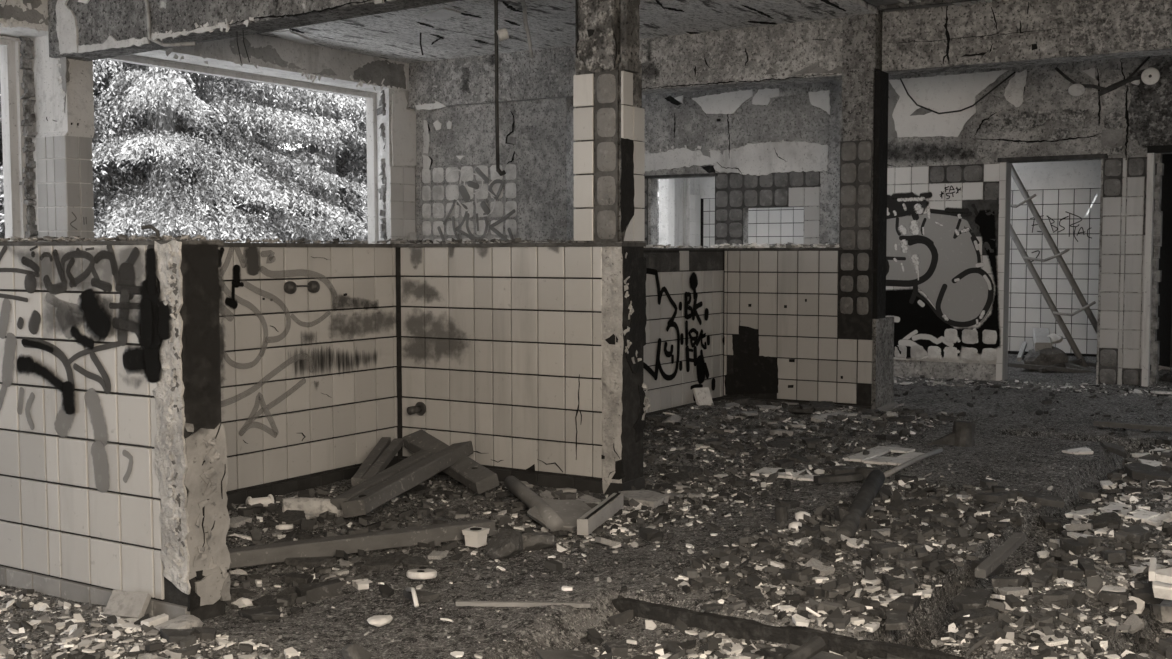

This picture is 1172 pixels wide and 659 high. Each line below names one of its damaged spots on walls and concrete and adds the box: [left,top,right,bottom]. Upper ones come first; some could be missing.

spalling [0,0,49,32]
crack [889,2,1060,64]
crack [974,112,1102,143]
peeling [578,0,842,494]
peeling [735,94,872,315]
peeling [887,164,999,281]
flaking render [152,240,231,611]